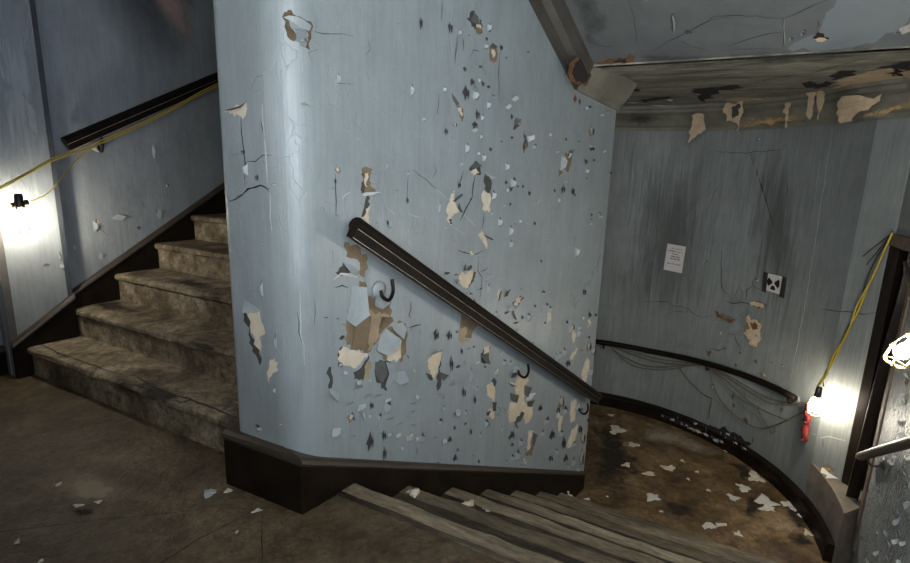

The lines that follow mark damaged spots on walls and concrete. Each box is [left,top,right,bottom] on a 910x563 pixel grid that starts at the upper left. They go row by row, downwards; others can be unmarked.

crack [586,1,824,74]
peeling [788,0,910,53]
peeling [439,11,540,248]
peeling [688,113,706,143]
peeling [690,55,910,134]
crack [226,104,276,230]
peeling [361,167,380,224]
crack [642,257,762,317]
peeling [242,300,278,383]
peeling [326,242,590,471]
peeling [555,311,597,382]
peeling [713,301,765,347]